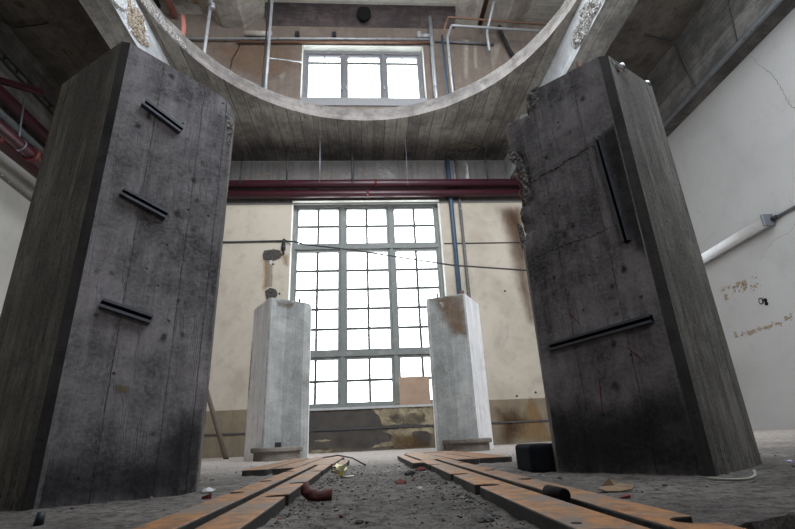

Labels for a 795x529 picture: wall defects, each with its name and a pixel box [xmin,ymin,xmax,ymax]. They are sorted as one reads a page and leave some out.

spalling [111,0,193,56]
spalling [570,0,605,49]
crack [529,146,592,183]
peeling [721,276,761,300]